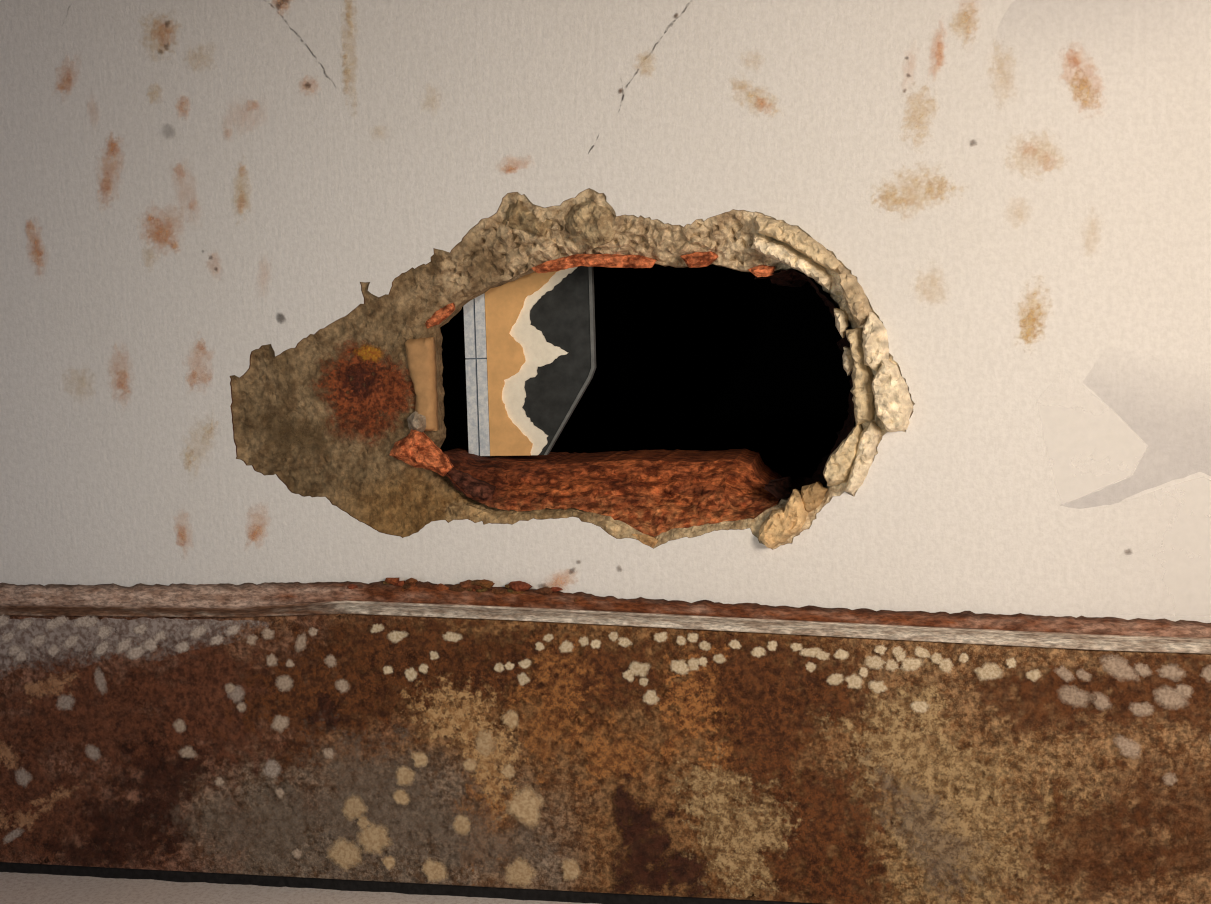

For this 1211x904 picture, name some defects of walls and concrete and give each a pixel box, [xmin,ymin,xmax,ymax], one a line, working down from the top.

rust [317,340,416,444]
spalling [231,188,915,549]
rust [0,616,902,904]
damp [822,669,1049,904]
rust [969,652,1211,746]